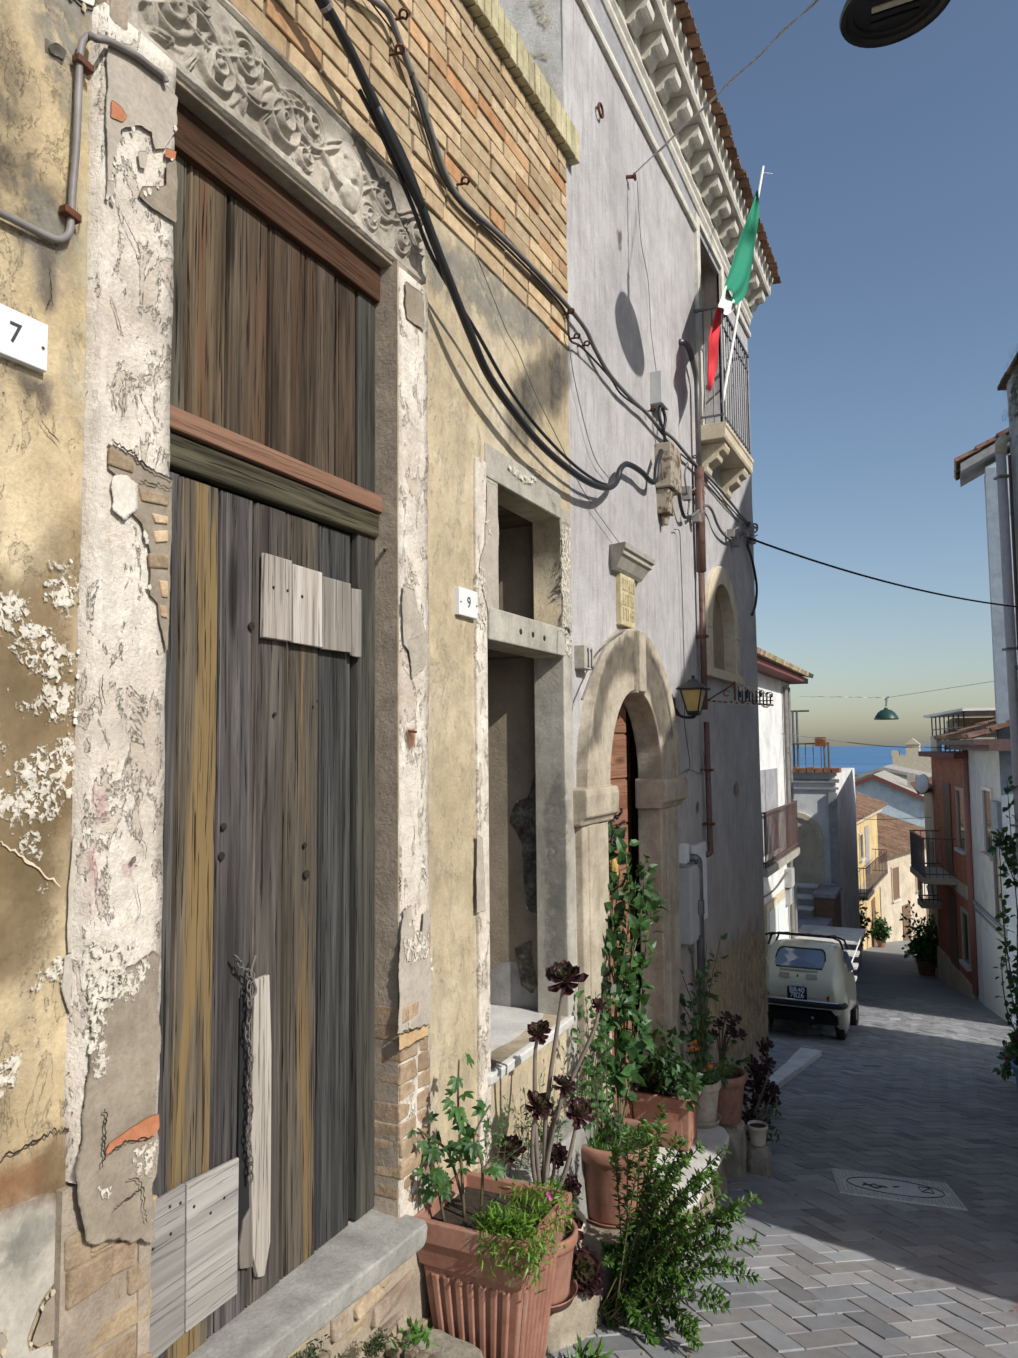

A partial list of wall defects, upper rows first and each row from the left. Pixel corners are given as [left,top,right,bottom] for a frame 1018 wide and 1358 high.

leakage [41,0,92,72]
leakage [63,89,90,133]
peeling [105,45,178,222]
leakage [31,188,89,304]
leakage [425,234,570,443]
flaking render [108,440,172,650]
peeling [0,558,81,861]
flaking render [509,774,537,915]
peeling [0,1048,27,1100]
peeling [29,836,161,1245]
crack [0,1127,69,1163]
crack [100,1109,154,1222]